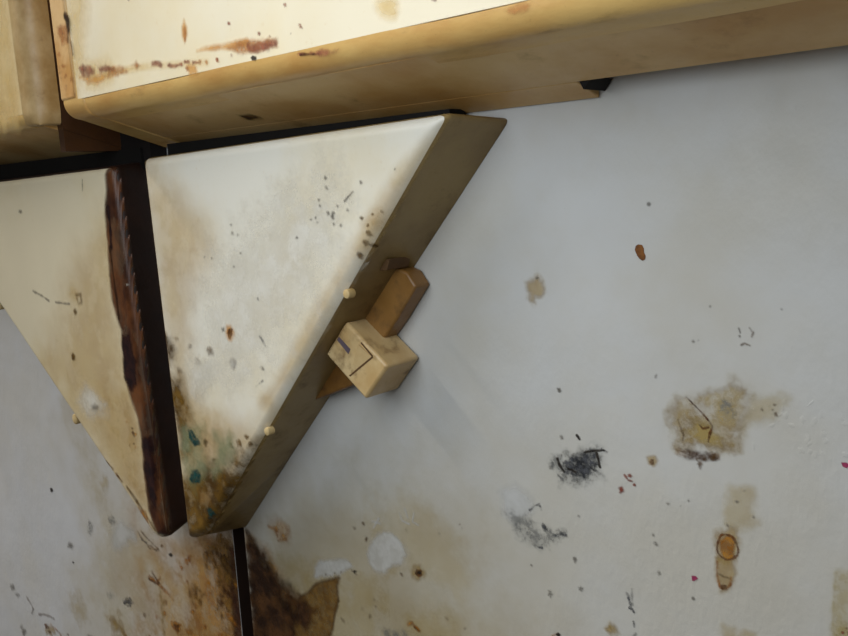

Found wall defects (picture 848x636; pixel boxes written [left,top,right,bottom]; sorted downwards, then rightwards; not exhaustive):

leakage [677,394,738,445]
leakage [678,450,718,467]
rust [716,534,739,560]